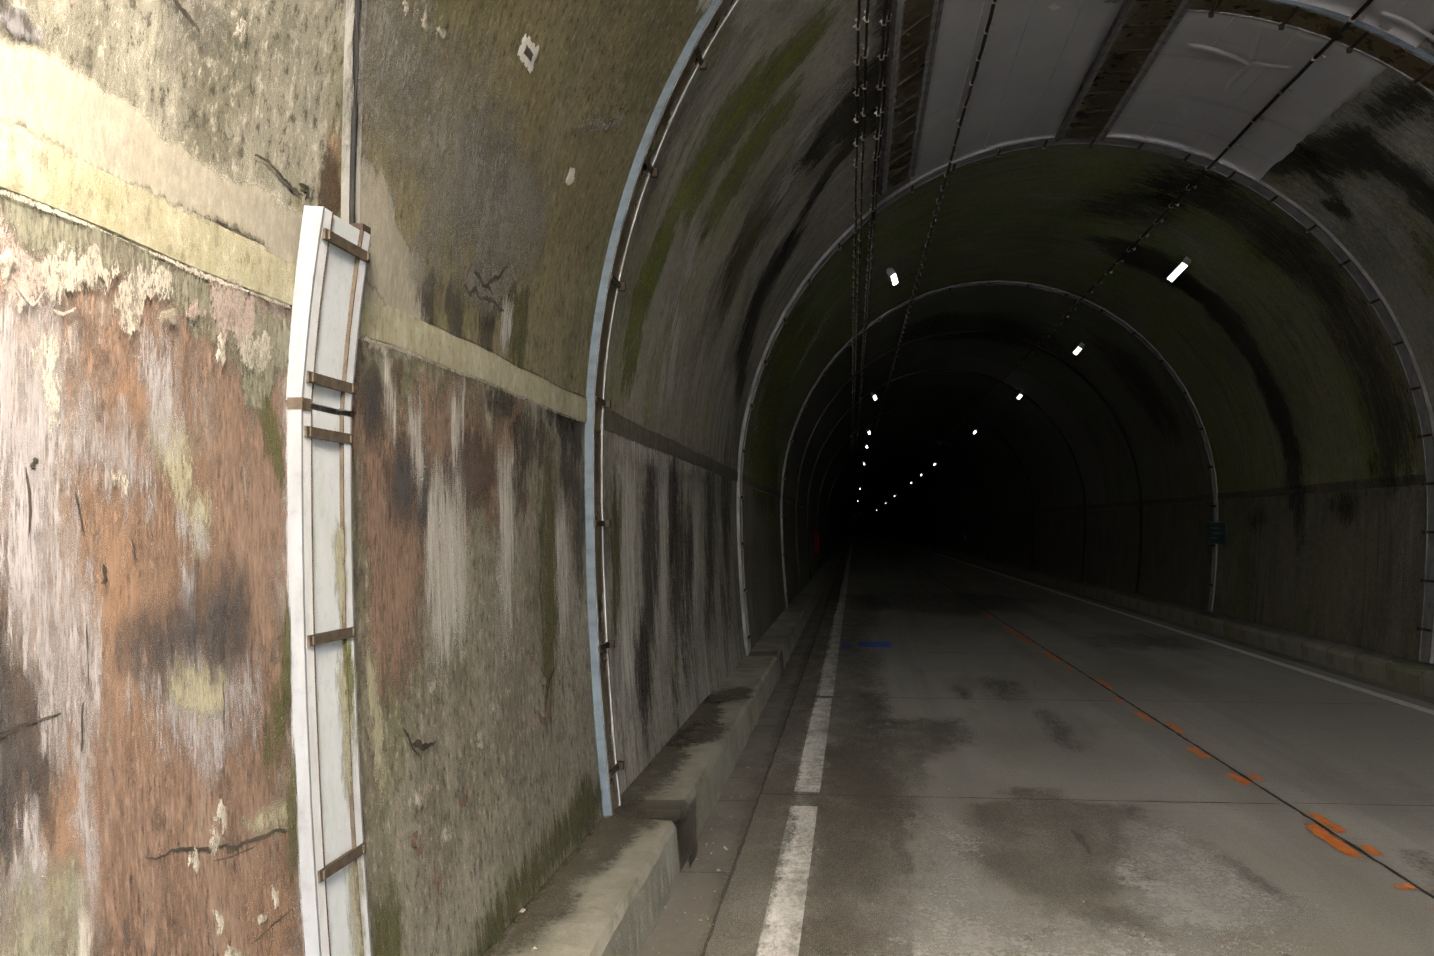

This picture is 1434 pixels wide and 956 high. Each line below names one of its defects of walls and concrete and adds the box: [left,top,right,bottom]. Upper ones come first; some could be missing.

crack [159,0,225,60]
crack [254,154,309,201]
water stain [344,0,548,369]
water stain [714,0,889,407]
water stain [1269,80,1434,224]
water stain [0,282,299,956]
water stain [366,638,385,799]
water stain [364,349,469,675]
water stain [484,197,755,956]